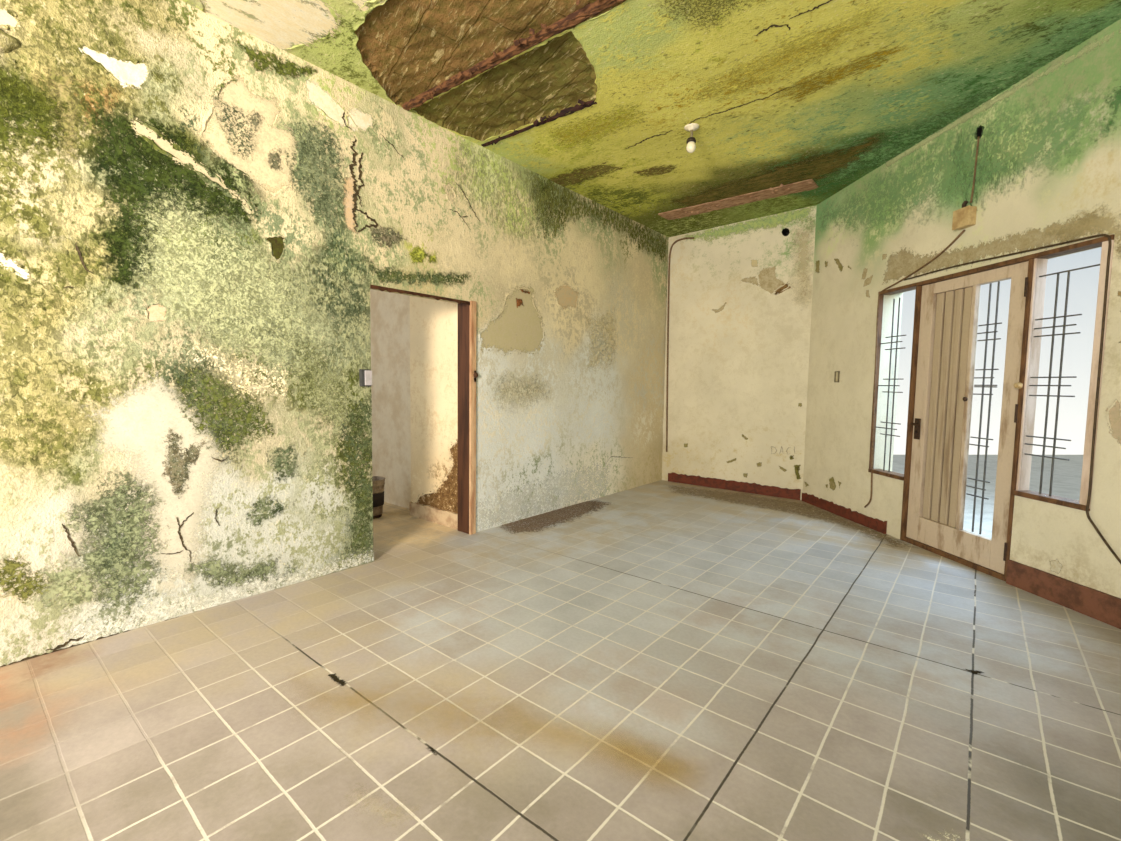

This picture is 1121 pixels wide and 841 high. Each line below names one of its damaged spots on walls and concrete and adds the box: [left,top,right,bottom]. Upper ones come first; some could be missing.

damp [231,37,317,80]
peeling [195,0,631,110]
damp [698,1,903,102]
crack [341,111,404,234]
damp [449,147,675,263]
damp [550,105,646,148]
damp [672,31,1121,294]
damp [0,56,374,645]
flaking render [478,284,545,355]
flaking render [1105,397,1121,444]